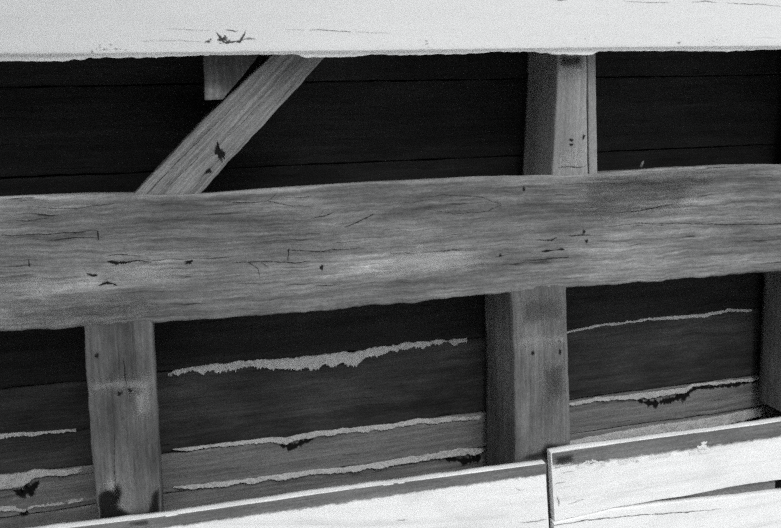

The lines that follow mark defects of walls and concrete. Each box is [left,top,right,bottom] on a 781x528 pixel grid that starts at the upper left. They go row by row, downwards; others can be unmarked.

peeling [205,30,255,44]
spalling [637,380,757,409]
spalling [280,438,313,451]
spalling [446,454,481,465]
spalling [13,480,39,498]